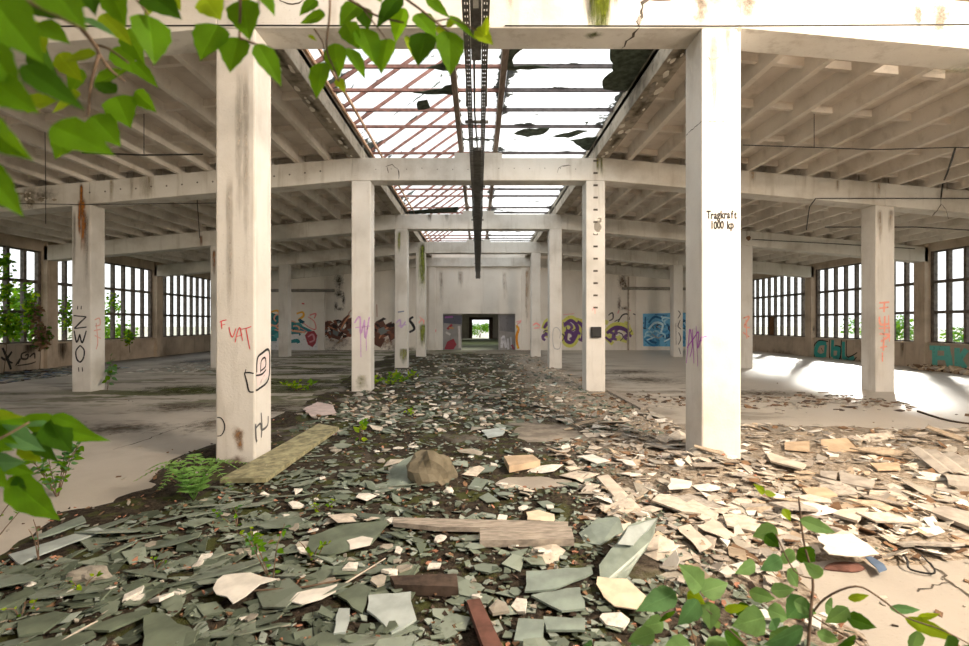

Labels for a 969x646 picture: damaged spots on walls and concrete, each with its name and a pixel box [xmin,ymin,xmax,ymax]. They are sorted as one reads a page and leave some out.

water stain [586,0,610,27]
crack [622,0,671,48]
water stain [935,7,950,29]
rust [78,185,86,241]
crack [917,562,969,596]